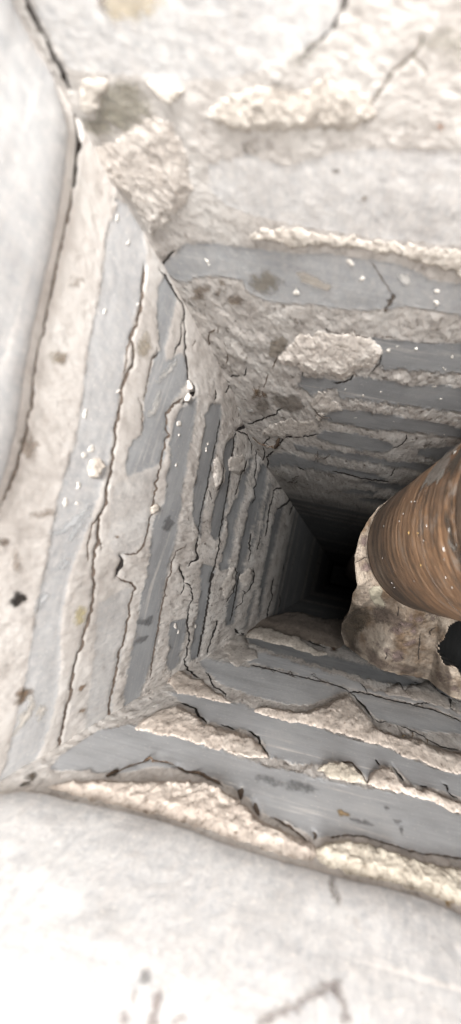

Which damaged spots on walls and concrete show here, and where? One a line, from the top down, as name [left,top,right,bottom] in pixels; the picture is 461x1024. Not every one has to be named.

crack [300,0,348,59]
crack [362,37,429,130]
peeling [278,331,383,381]
crack [330,332,394,384]
peeling [262,391,343,439]
crack [334,434,407,482]
crack [57,250,316,746]
peeling [239,567,253,587]
spalling [369,582,395,608]